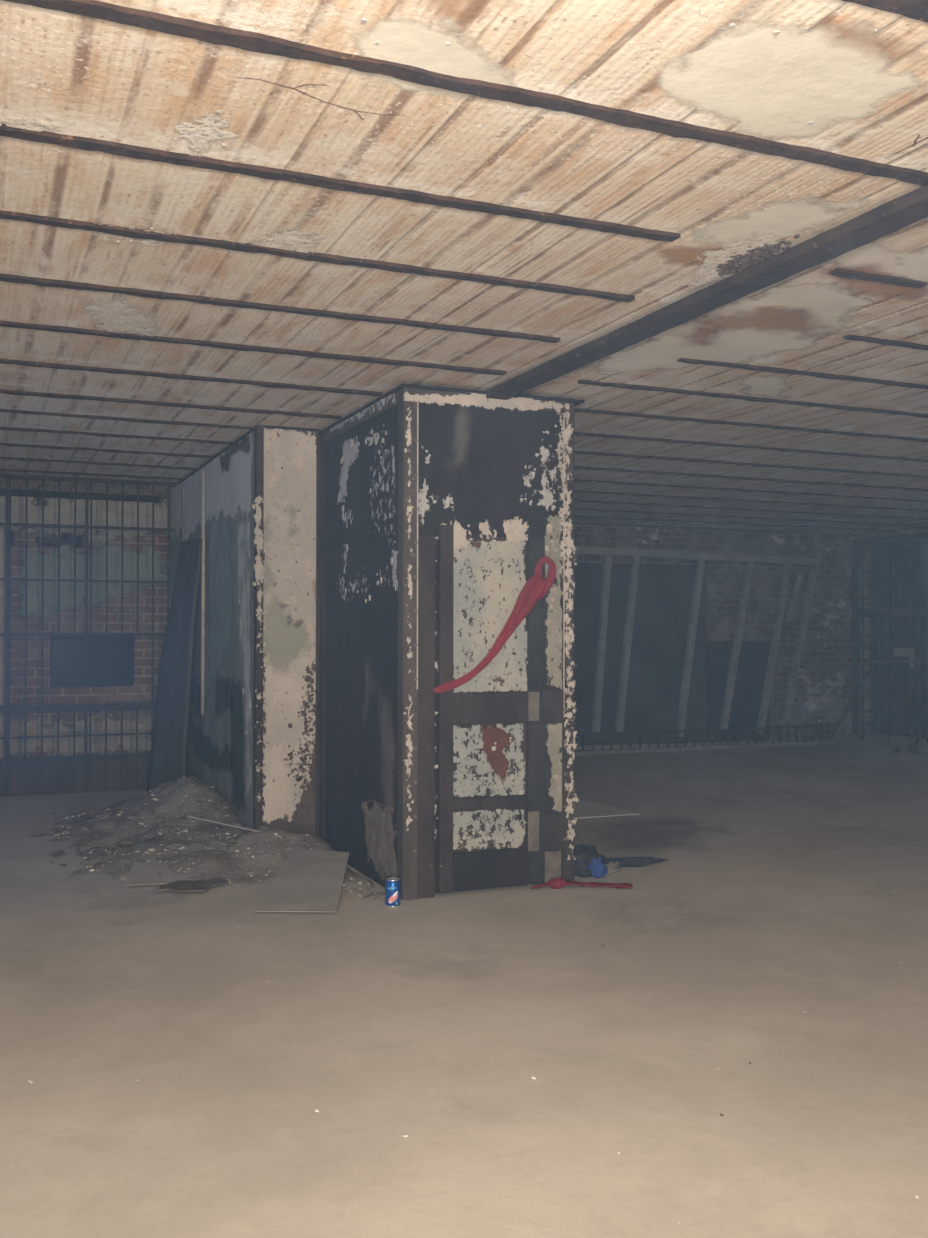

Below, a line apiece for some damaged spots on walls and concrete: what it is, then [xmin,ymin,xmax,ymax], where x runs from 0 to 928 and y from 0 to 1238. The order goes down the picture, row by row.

water stain [189,675,246,812]
peeling [0,391,579,881]